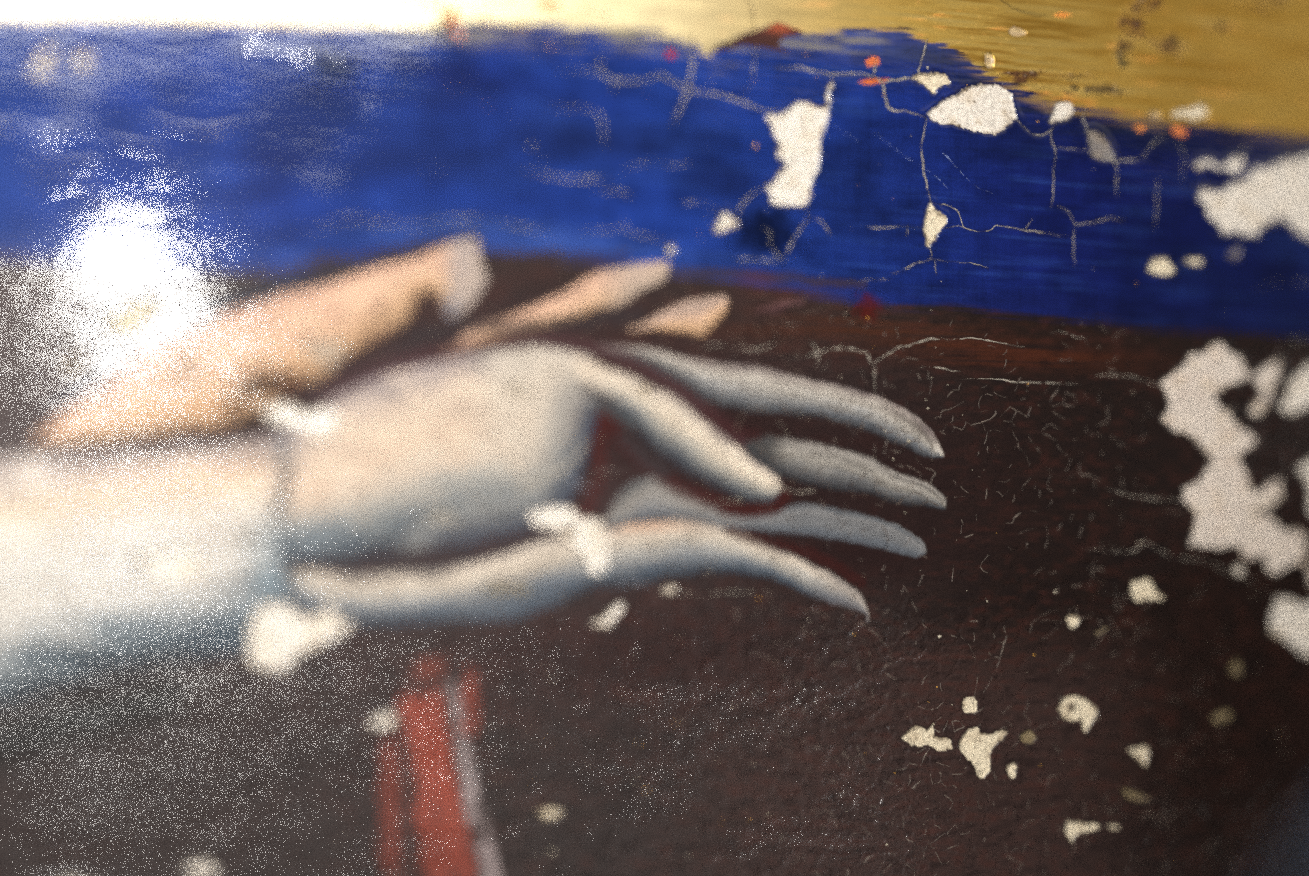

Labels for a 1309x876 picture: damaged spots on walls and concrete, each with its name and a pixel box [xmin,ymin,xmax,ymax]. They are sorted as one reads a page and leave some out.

peeling [911,53,1017,136]
peeling [765,81,834,207]
crack [566,37,1166,281]
peeling [924,204,947,248]
peeling [1194,155,1309,260]
crack [714,335,1162,387]
peeling [1161,343,1309,576]
peeling [528,506,610,576]
peeling [249,601,355,671]
peeling [1269,597,1309,657]
peeling [902,697,1037,779]
peeling [1058,696,1098,733]